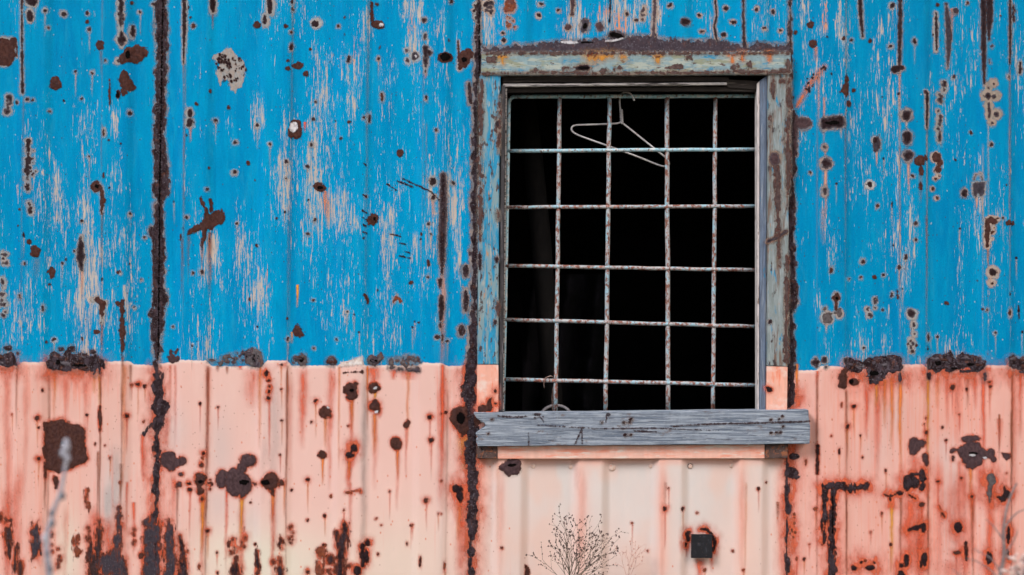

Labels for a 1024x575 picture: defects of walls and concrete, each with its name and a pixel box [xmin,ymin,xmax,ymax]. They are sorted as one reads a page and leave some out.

peeling [209,48,247,94]
rust [980,0,1003,126]
rust [180,196,225,258]
rust [471,0,856,409]
rust [960,172,1014,288]
rust [864,297,878,319]
rust [0,295,294,575]
rust [499,459,521,477]
rust [777,356,1024,575]
rust [305,509,379,575]
rust [681,507,719,575]